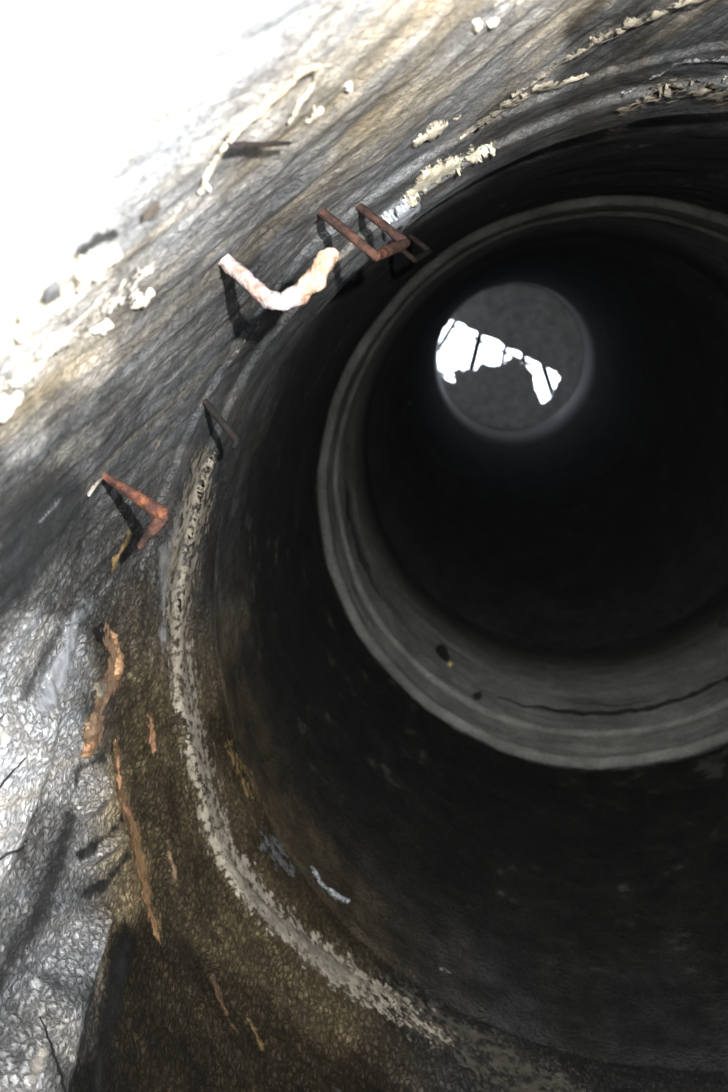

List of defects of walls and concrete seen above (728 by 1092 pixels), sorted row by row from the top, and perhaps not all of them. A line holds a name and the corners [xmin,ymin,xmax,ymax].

peeling [472,0,531,33]
damp [604,74,728,141]
damp [412,114,461,148]
spalling [143,201,161,221]
damp [382,143,496,245]
spalling [0,228,164,423]
damp [0,481,77,615]
damp [111,530,131,573]
spalling [310,865,351,905]